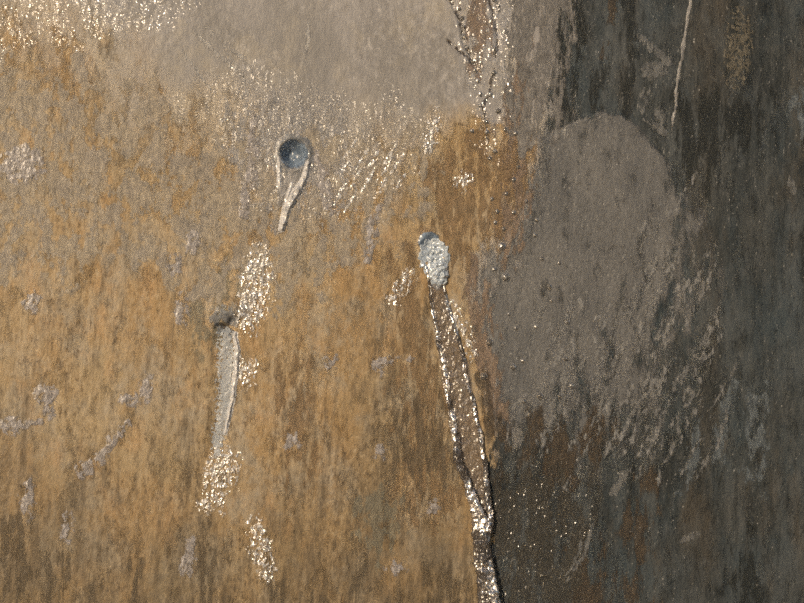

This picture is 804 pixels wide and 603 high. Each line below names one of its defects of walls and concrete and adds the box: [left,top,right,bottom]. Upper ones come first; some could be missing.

crack [447,0,499,142]
damp [0,26,444,337]
rust [0,0,537,603]
damp [273,338,323,491]
rust [519,407,617,491]
damp [246,515,284,603]